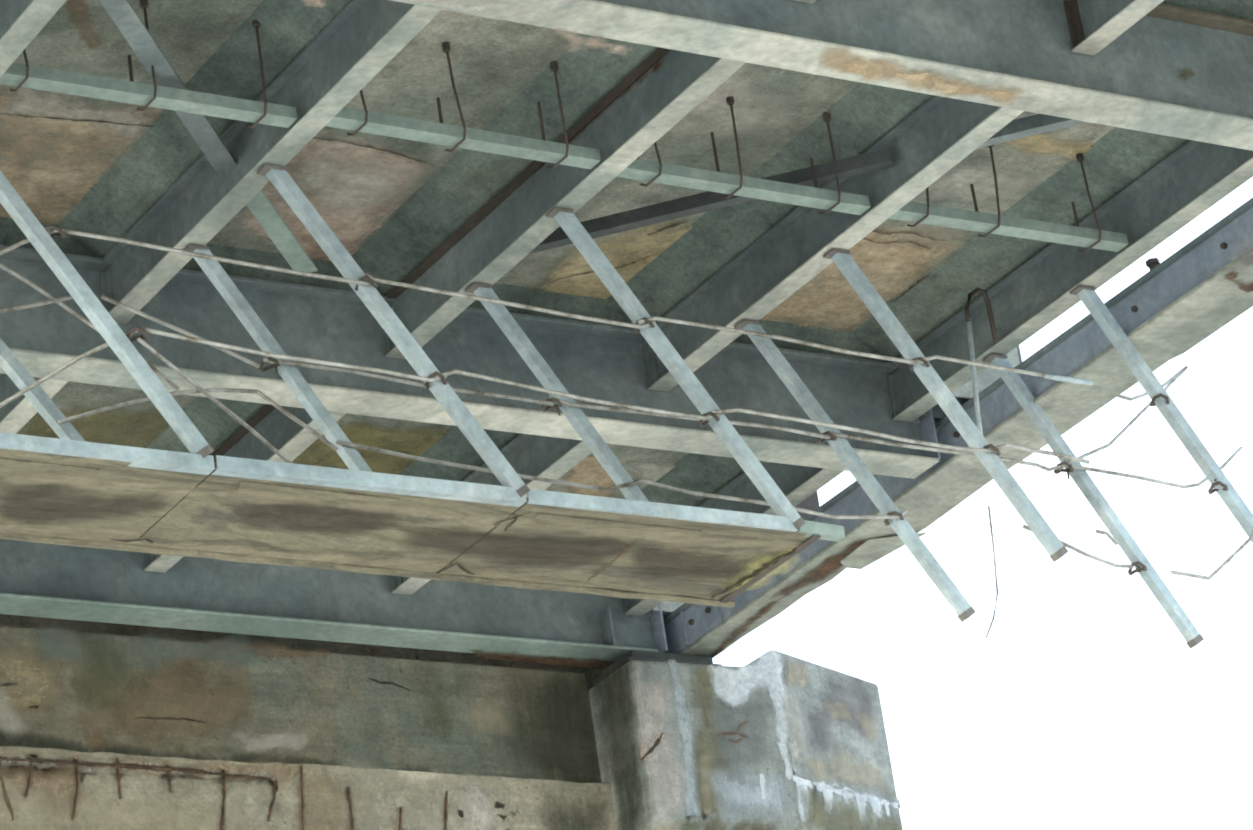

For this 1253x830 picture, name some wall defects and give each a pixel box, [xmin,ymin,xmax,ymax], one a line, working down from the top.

rust [1226,273,1253,292]
leakage [3,483,157,523]
leakage [246,506,393,534]
rust [712,540,865,657]
leakage [105,671,246,734]
leakage [645,650,901,830]
spalling [0,755,305,830]
spalling [378,783,509,830]